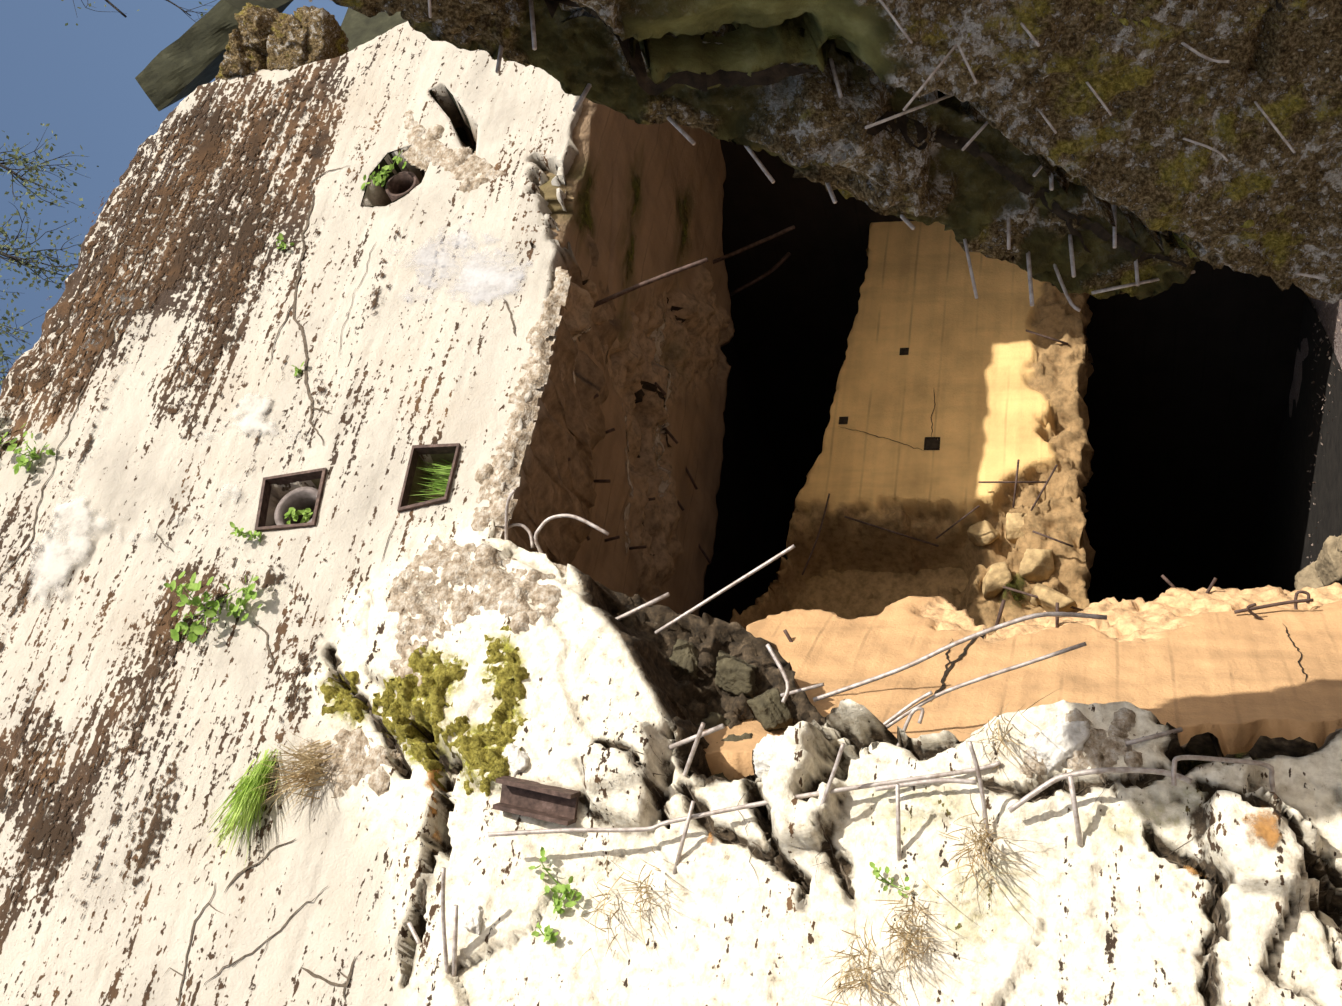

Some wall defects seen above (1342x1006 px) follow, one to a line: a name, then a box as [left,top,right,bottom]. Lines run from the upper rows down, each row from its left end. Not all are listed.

damp [364,259,403,315]
damp [0,55,342,652]
damp [279,626,323,728]
spalling [616,592,670,621]
spalling [655,544,795,634]
spalling [766,586,1107,703]
spalling [1234,590,1314,620]
crack [1282,623,1307,682]
damp [0,536,292,921]
crack [316,677,458,790]
crack [619,747,849,905]
crack [984,770,1156,810]